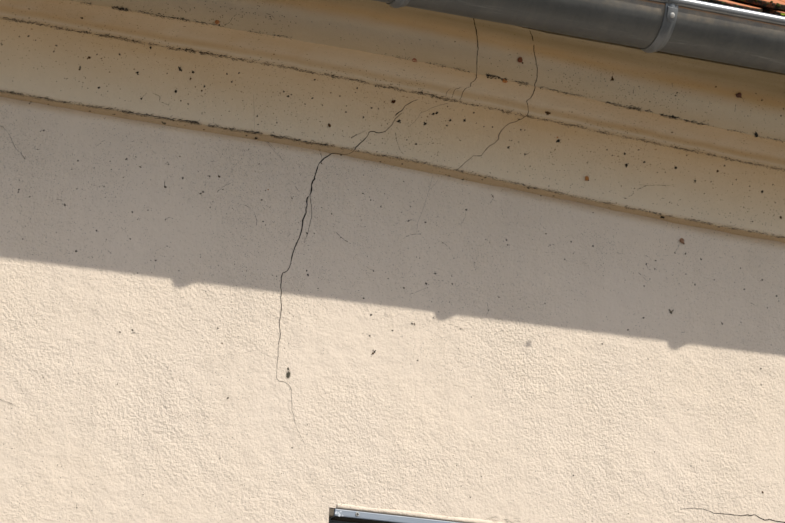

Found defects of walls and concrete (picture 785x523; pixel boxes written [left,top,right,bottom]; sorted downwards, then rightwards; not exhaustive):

crack [459,32,538,168]
crack [276,18,478,442]
crack [685,508,785,523]